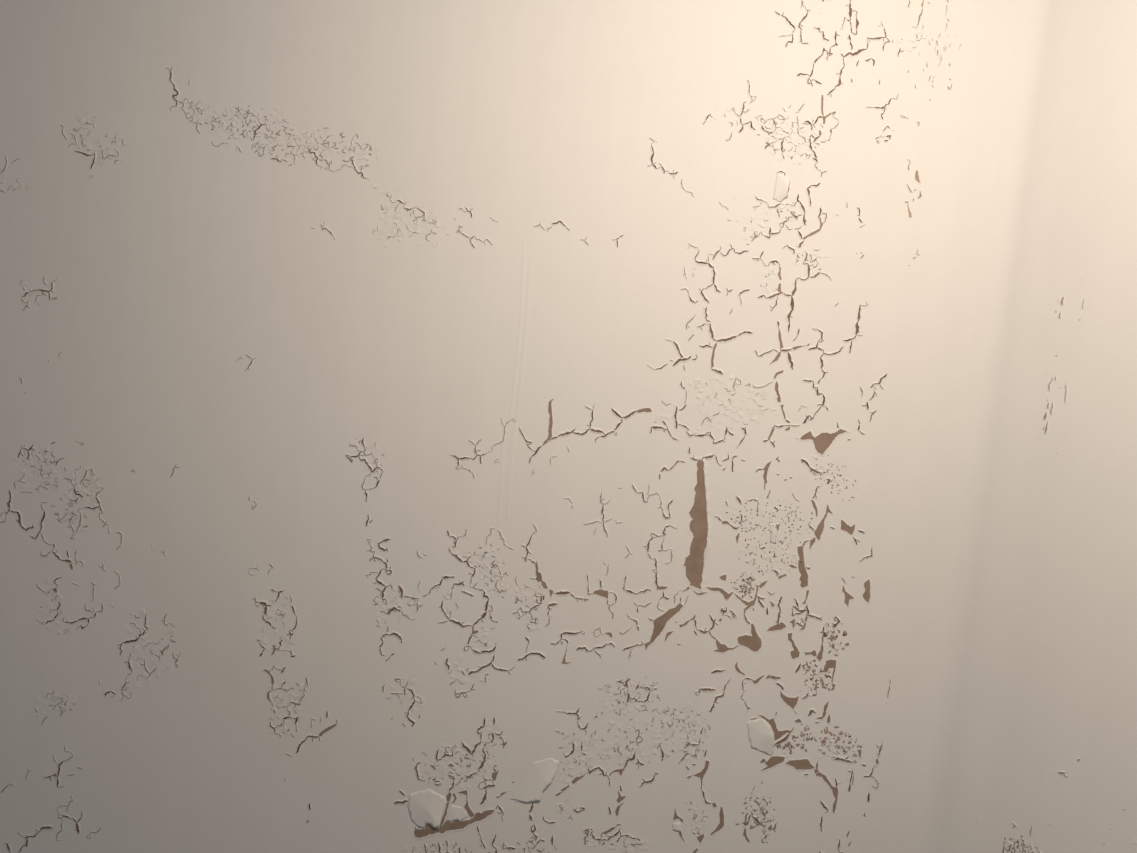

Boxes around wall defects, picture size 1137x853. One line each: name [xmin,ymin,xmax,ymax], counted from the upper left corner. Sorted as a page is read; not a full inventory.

crack [165,67,499,249]
crack [646,0,921,427]
crack [0,440,182,725]
crack [248,562,310,738]
crack [449,417,516,479]
crack [345,436,710,853]
peeling [518,371,874,818]
crack [714,453,856,599]
crack [0,745,102,853]
peeling [394,717,560,841]
peeling [692,759,726,837]
crack [777,723,881,853]